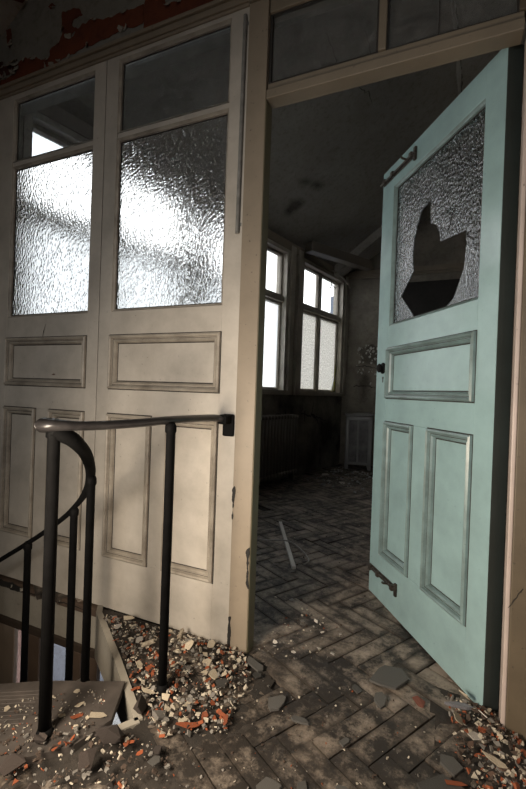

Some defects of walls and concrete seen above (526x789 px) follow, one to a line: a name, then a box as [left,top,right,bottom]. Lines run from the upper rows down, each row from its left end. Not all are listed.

peeling [0,0,214,85]